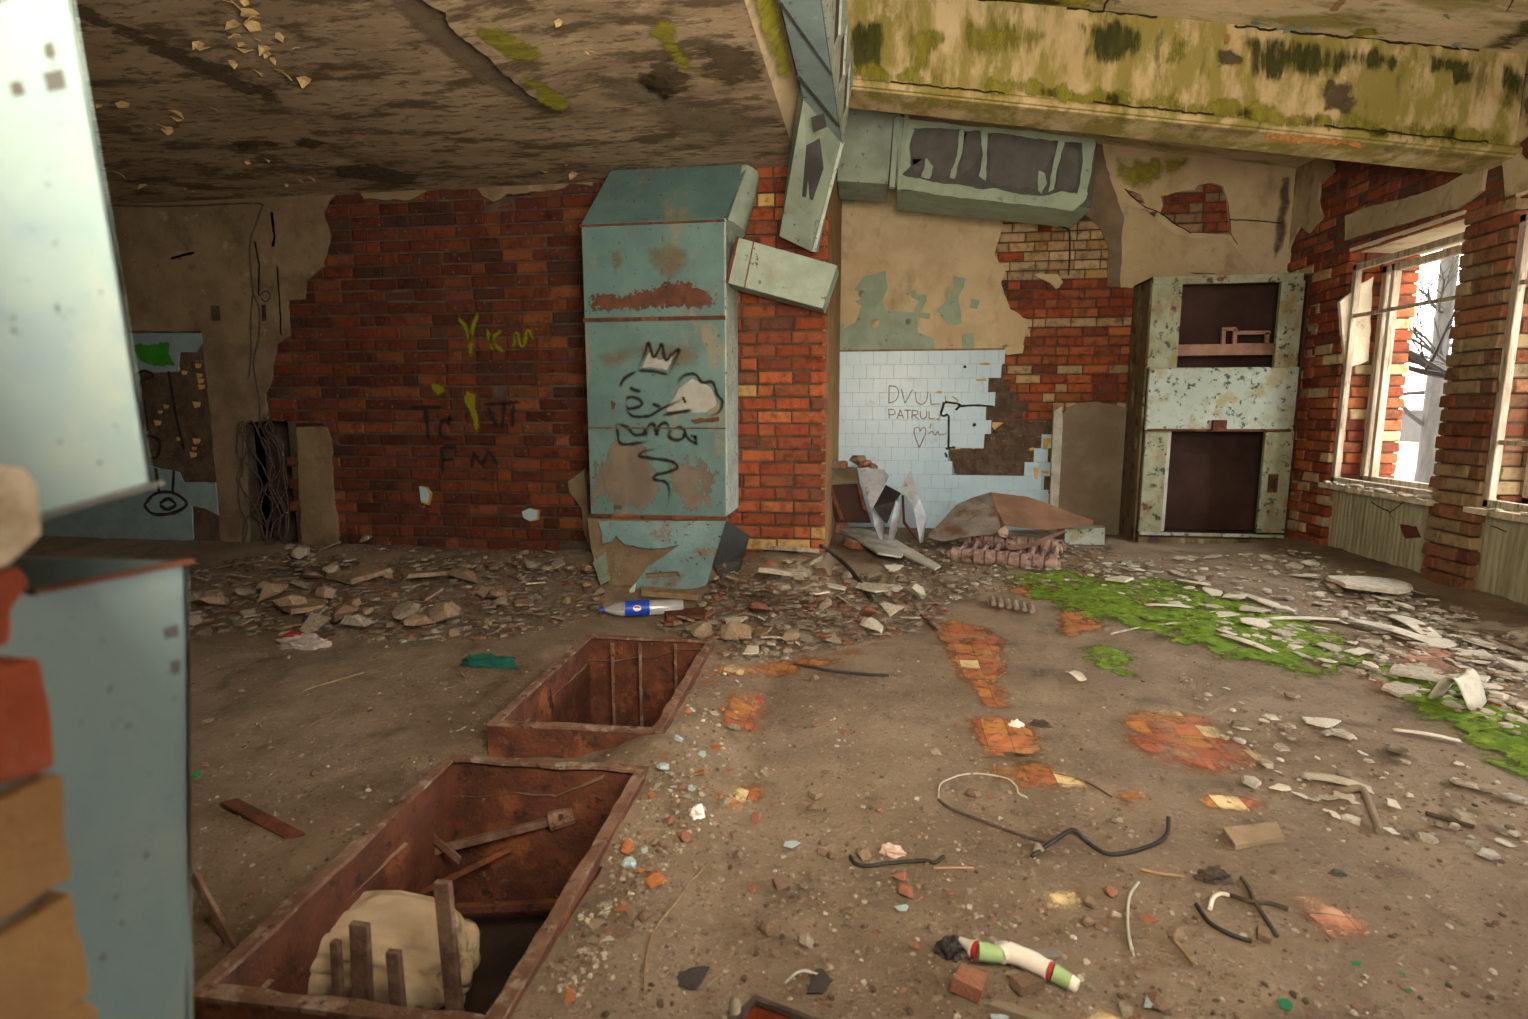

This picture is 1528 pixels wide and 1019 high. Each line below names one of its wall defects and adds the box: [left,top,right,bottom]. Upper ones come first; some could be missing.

crack [1066,0,1157,19]
water stain [1082,20,1140,63]
crack [1234,25,1480,52]
water stain [1488,21,1528,48]
water stain [1218,39,1397,114]
water stain [1431,57,1471,85]
water stain [1503,66,1528,125]
water stain [232,138,327,150]
water stain [335,164,420,184]
flaking render [1160,184,1230,235]
flaking render [840,117,1143,493]
flaking render [201,165,721,552]